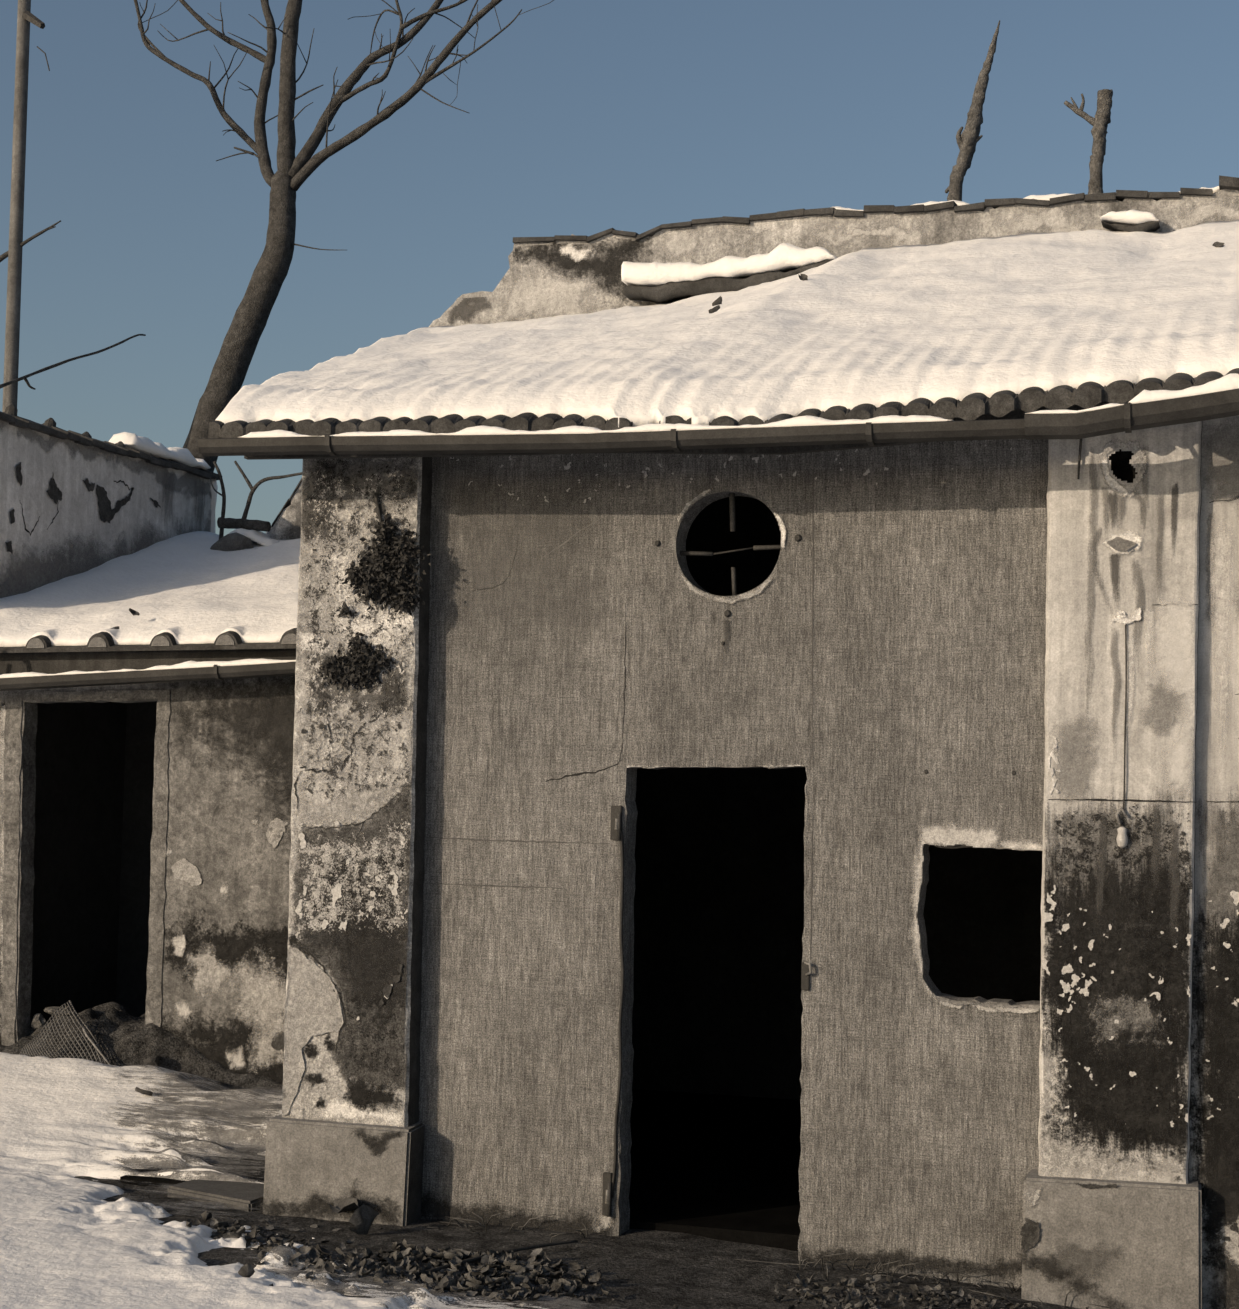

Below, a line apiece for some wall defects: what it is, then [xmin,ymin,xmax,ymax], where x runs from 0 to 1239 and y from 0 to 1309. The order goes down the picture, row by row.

flaking render [10,474,62,536]
flaking render [82,478,134,523]
flaking render [1100,440,1147,497]
damp [1205,424,1239,498]
flaking render [1103,531,1142,554]
damp [1086,448,1179,734]
damp [1206,516,1239,741]
crack [545,603,626,782]
damp [161,457,418,1156]
peeling [295,885,307,918]
peeling [320,869,408,931]
damp [1041,718,1239,1309]